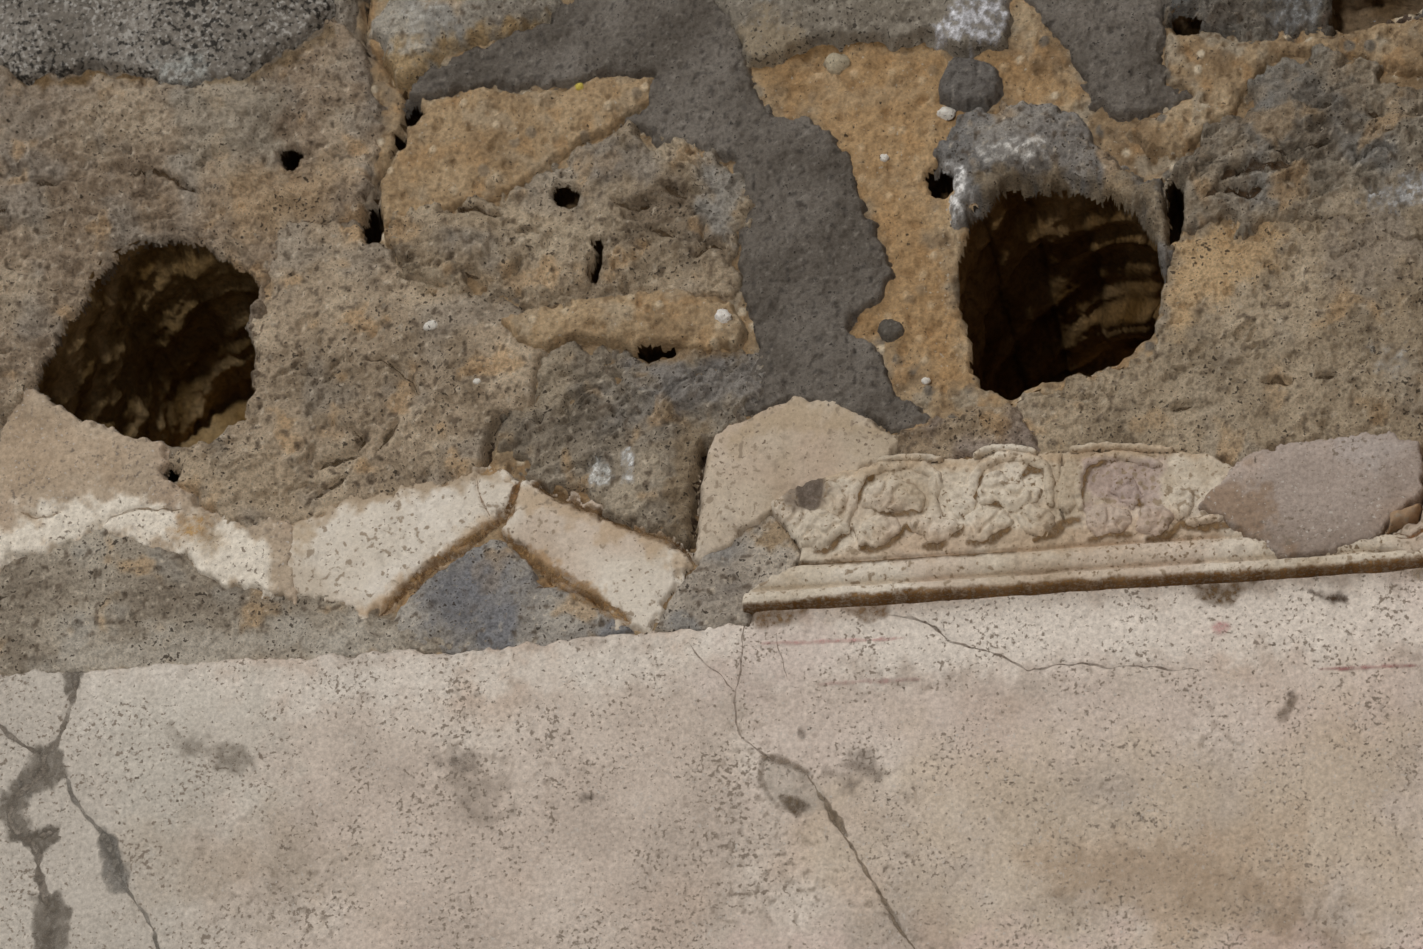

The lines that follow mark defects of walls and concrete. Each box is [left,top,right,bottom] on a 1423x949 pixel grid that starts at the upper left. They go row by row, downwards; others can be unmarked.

spalling [314,423,399,499]
spalling [0,528,635,676]
spalling [654,515,801,633]
crack [693,625,787,758]
crack [914,618,1197,671]
crack [0,671,159,949]
crack [808,776,915,949]